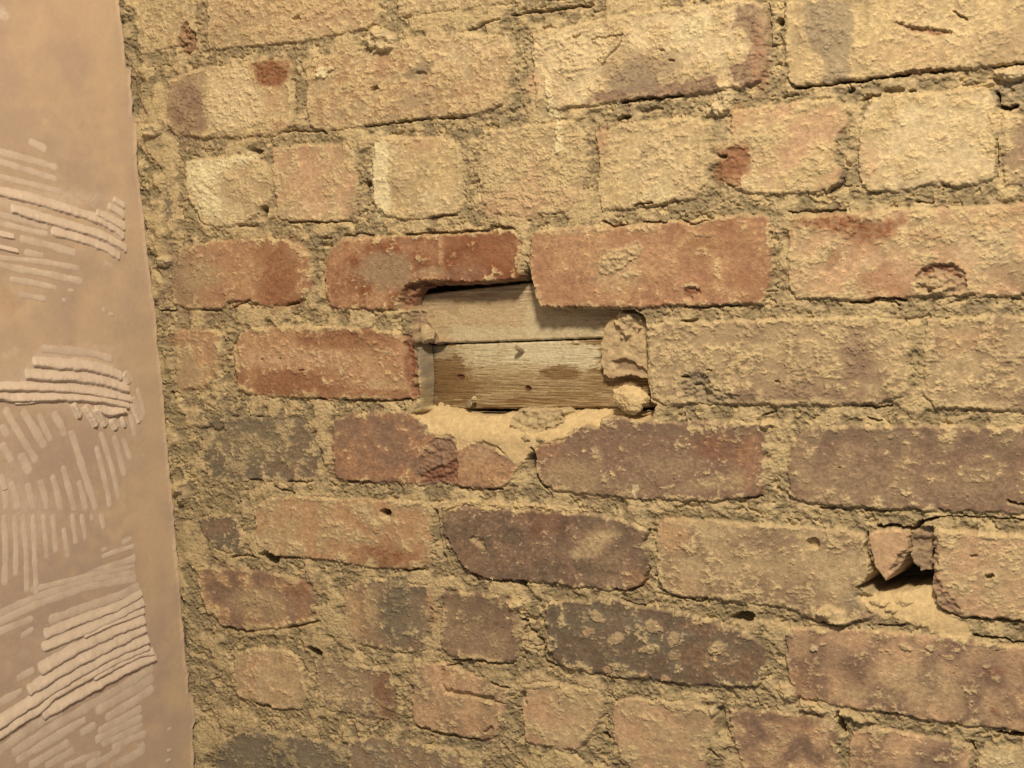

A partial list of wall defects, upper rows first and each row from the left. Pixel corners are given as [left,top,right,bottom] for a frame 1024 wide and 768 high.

spalling [397,264,648,342]
spalling [913,262,968,296]
spalling [401,340,434,409]
spalling [416,435,459,484]
spalling [856,525,967,617]